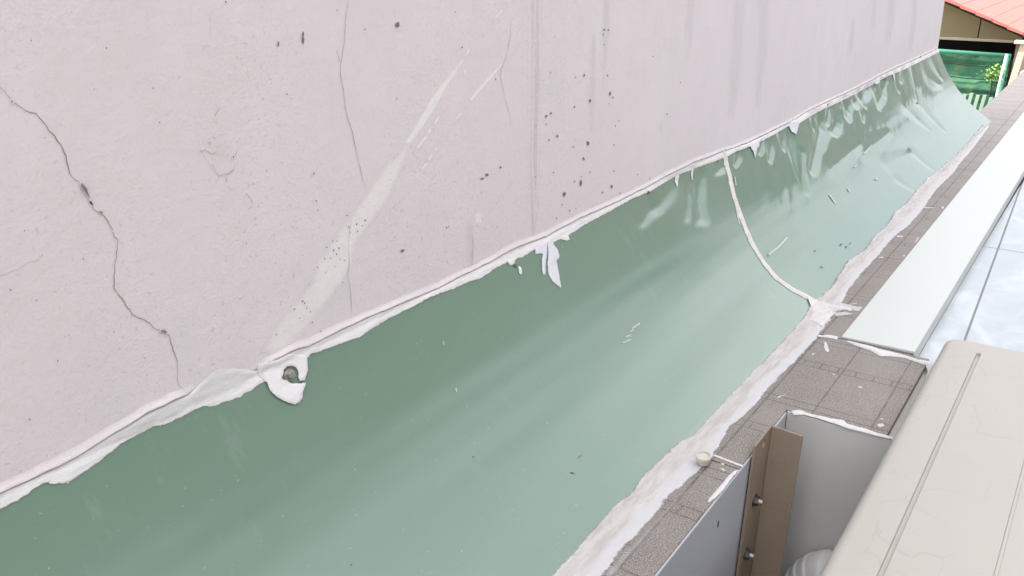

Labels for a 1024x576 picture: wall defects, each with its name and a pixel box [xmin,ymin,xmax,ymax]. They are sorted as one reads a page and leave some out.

crack [1,88,180,386]